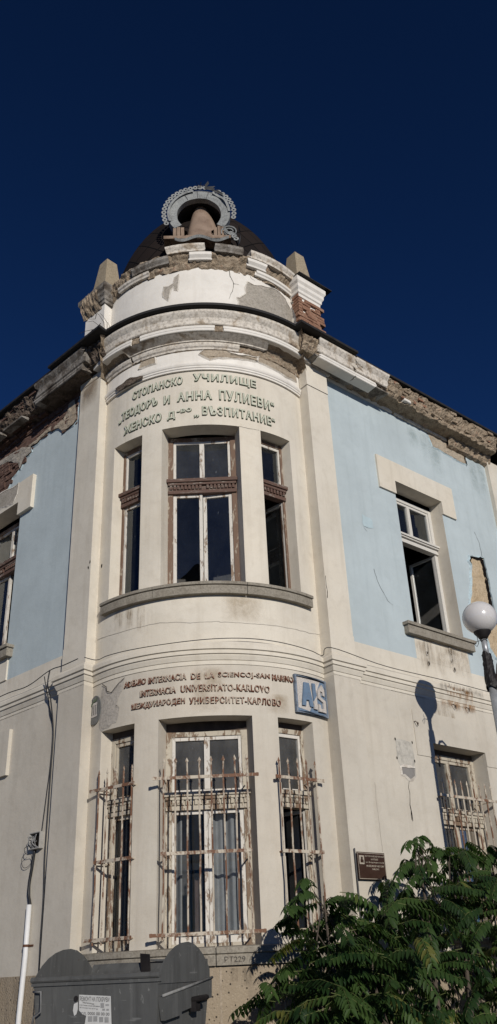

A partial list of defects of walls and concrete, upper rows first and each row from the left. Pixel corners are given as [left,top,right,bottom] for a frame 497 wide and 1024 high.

peeling [162,274,180,302]
flaking render [236,281,326,333]
flaking render [0,391,91,510]
flaking render [427,433,467,466]
flaking render [467,555,495,609]
flaking render [487,624,497,660]
flaking render [400,764,416,782]